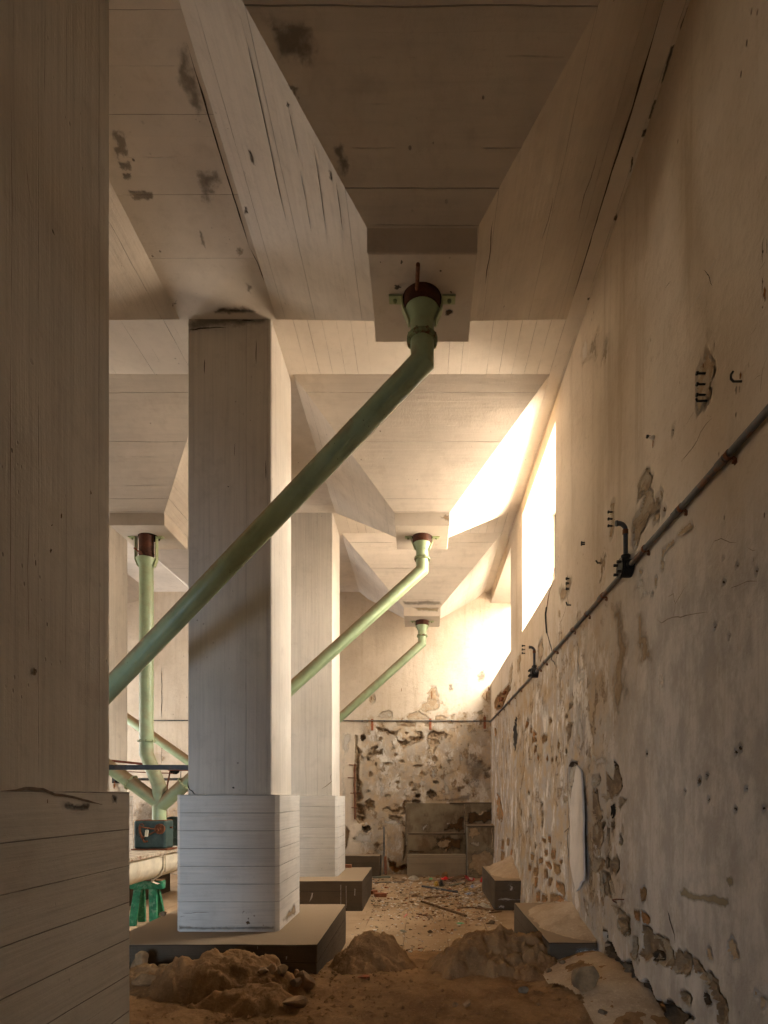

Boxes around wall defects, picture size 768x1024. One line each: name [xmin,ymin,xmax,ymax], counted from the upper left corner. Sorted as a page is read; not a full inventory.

crack [575,1,664,290]
peeling [633,468,666,547]
spalling [494,684,511,710]
crack [5,787,102,805]
spalling [345,699,454,861]
peeling [520,703,729,1024]